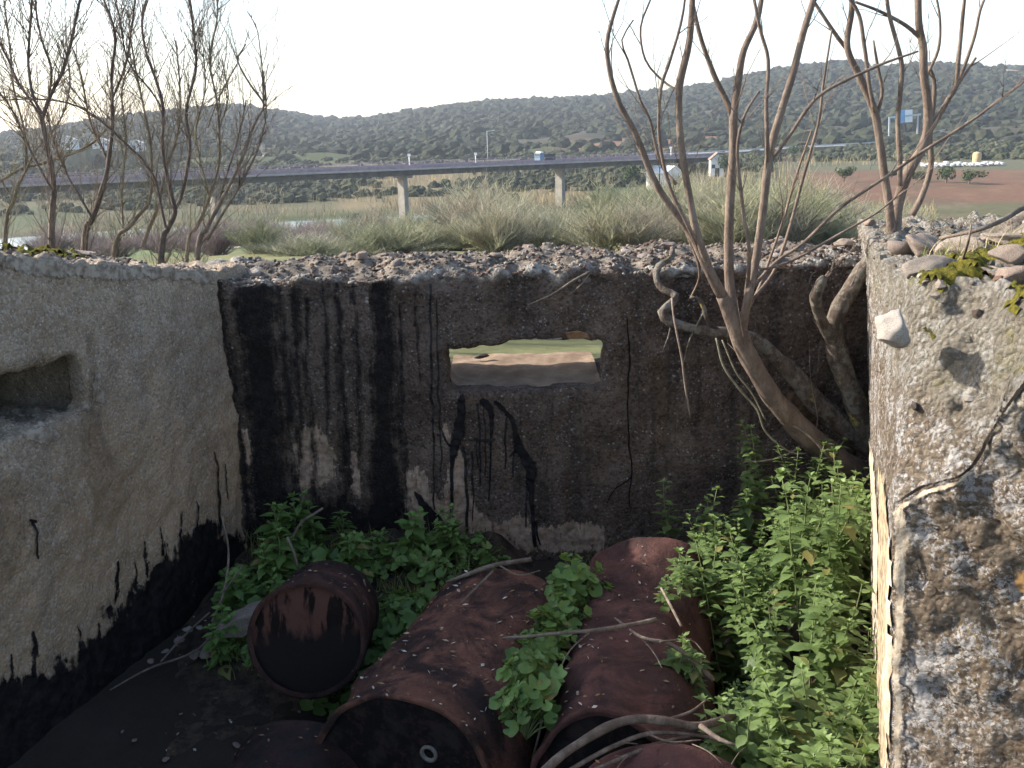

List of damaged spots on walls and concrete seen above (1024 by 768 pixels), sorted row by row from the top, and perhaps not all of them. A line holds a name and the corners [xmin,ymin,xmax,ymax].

water stain [29,519,39,559]
water stain [31,631,39,678]
water stain [134,541,150,590]
water stain [214,452,229,531]
water stain [217,279,541,547]
crack [607,317,633,507]
spalling [869,443,972,768]
crack [898,361,1024,502]